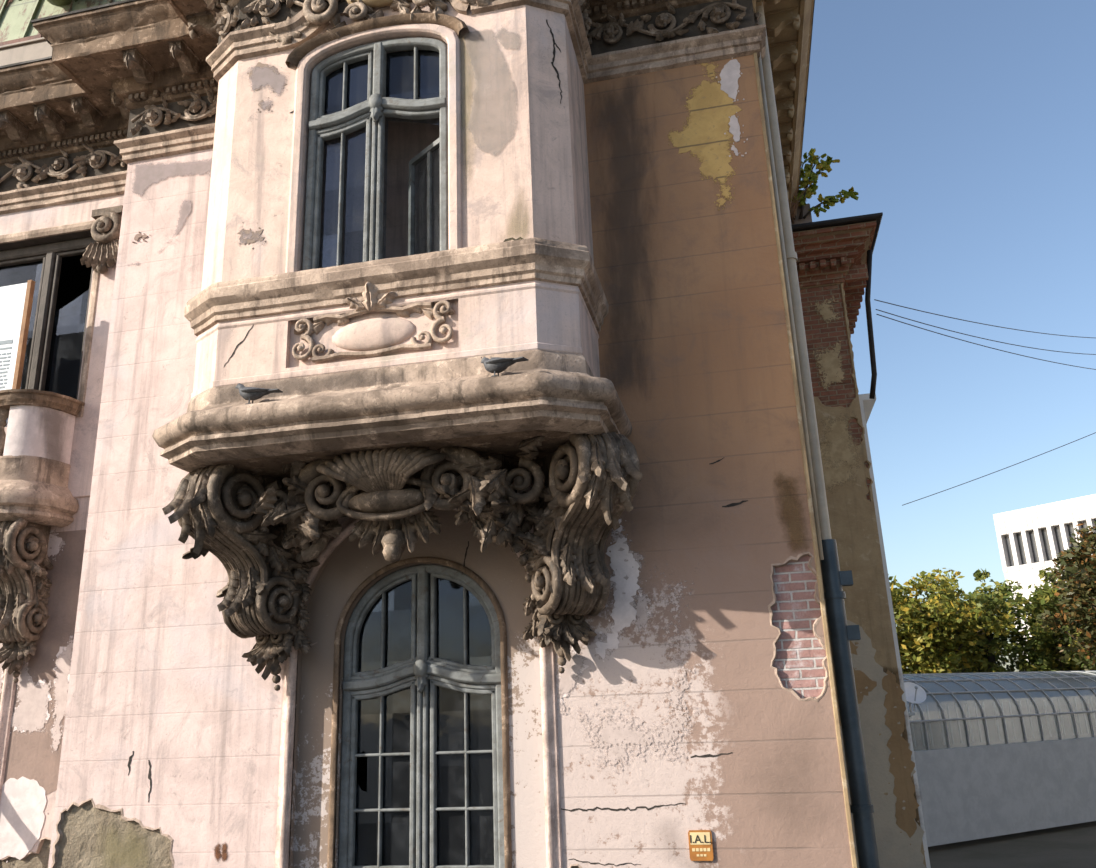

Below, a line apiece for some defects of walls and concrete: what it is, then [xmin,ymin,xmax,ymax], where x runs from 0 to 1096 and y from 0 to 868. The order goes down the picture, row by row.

crack [546,20,562,103]
peeling [668,57,748,211]
spalling [800,283,873,502]
peeling [3,529,86,795]
spalling [0,798,175,868]
crack [568,858,641,866]
crack [561,803,685,812]
spalling [768,552,859,868]
peeling [847,620,927,868]